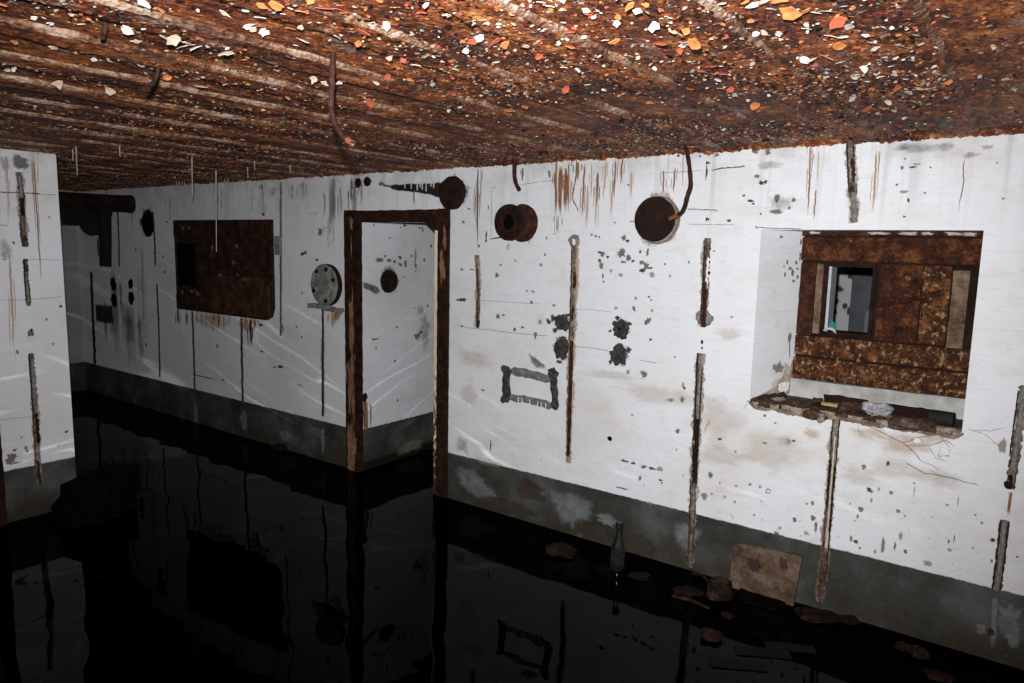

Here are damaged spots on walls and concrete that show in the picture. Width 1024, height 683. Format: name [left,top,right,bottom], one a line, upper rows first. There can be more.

rust [548,160,632,229]
rust [806,148,819,215]
spalling [846,143,859,223]
rust [870,152,880,201]
spalling [12,172,32,306]
rust [8,259,16,338]
rust [195,312,259,344]
spalling [514,234,600,463]
spalling [668,340,706,568]
crack [858,425,1003,485]
spalling [816,419,841,603]
spalling [988,385,1024,645]